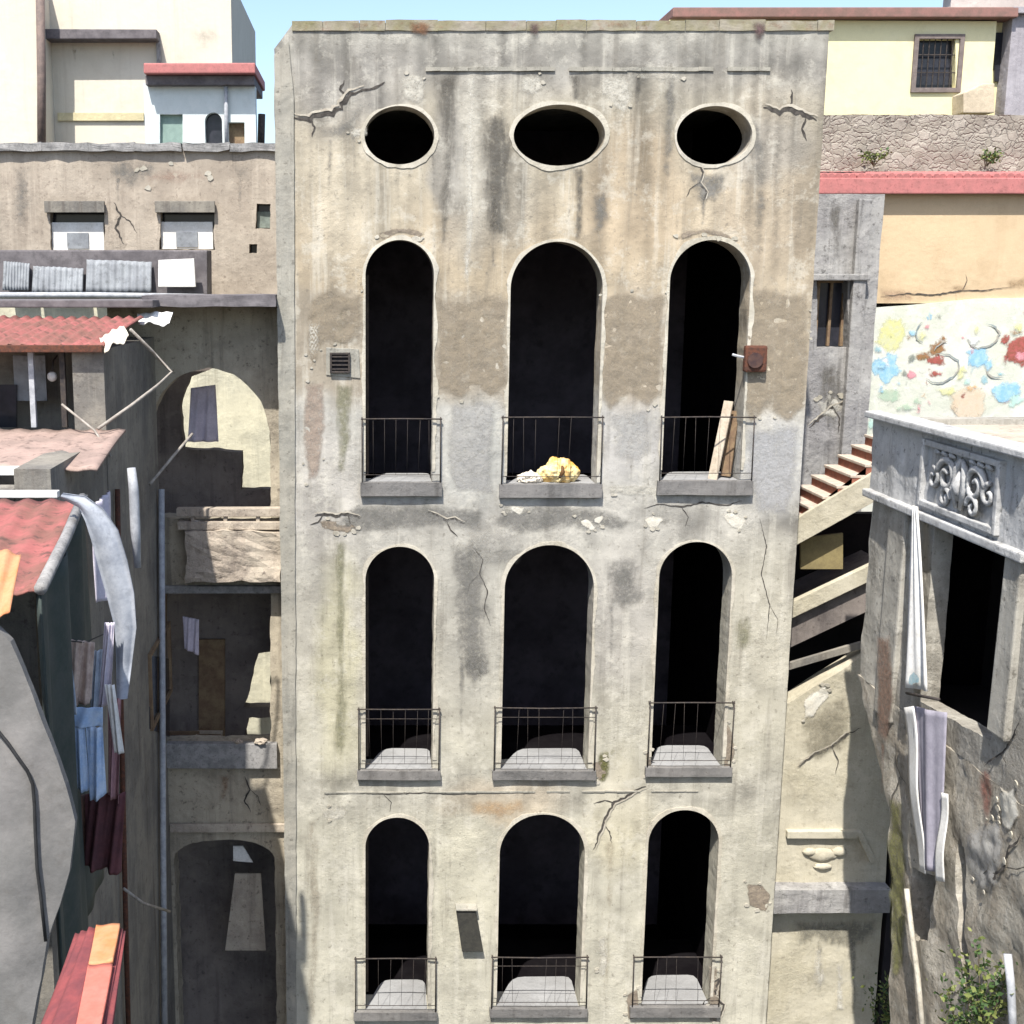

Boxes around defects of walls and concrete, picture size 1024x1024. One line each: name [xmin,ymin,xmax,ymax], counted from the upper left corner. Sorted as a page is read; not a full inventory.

crack [294,82,384,136]
crack [763,90,818,140]
leakage [486,117,510,231]
crack [114,203,137,244]
crack [881,277,1008,297]
flaking render [321,517,361,536]
leakage [613,567,639,603]
flaking render [802,683,832,722]
crack [799,726,860,770]
crack [593,786,646,850]
flaking render [968,780,1018,894]
flaking render [744,880,772,912]